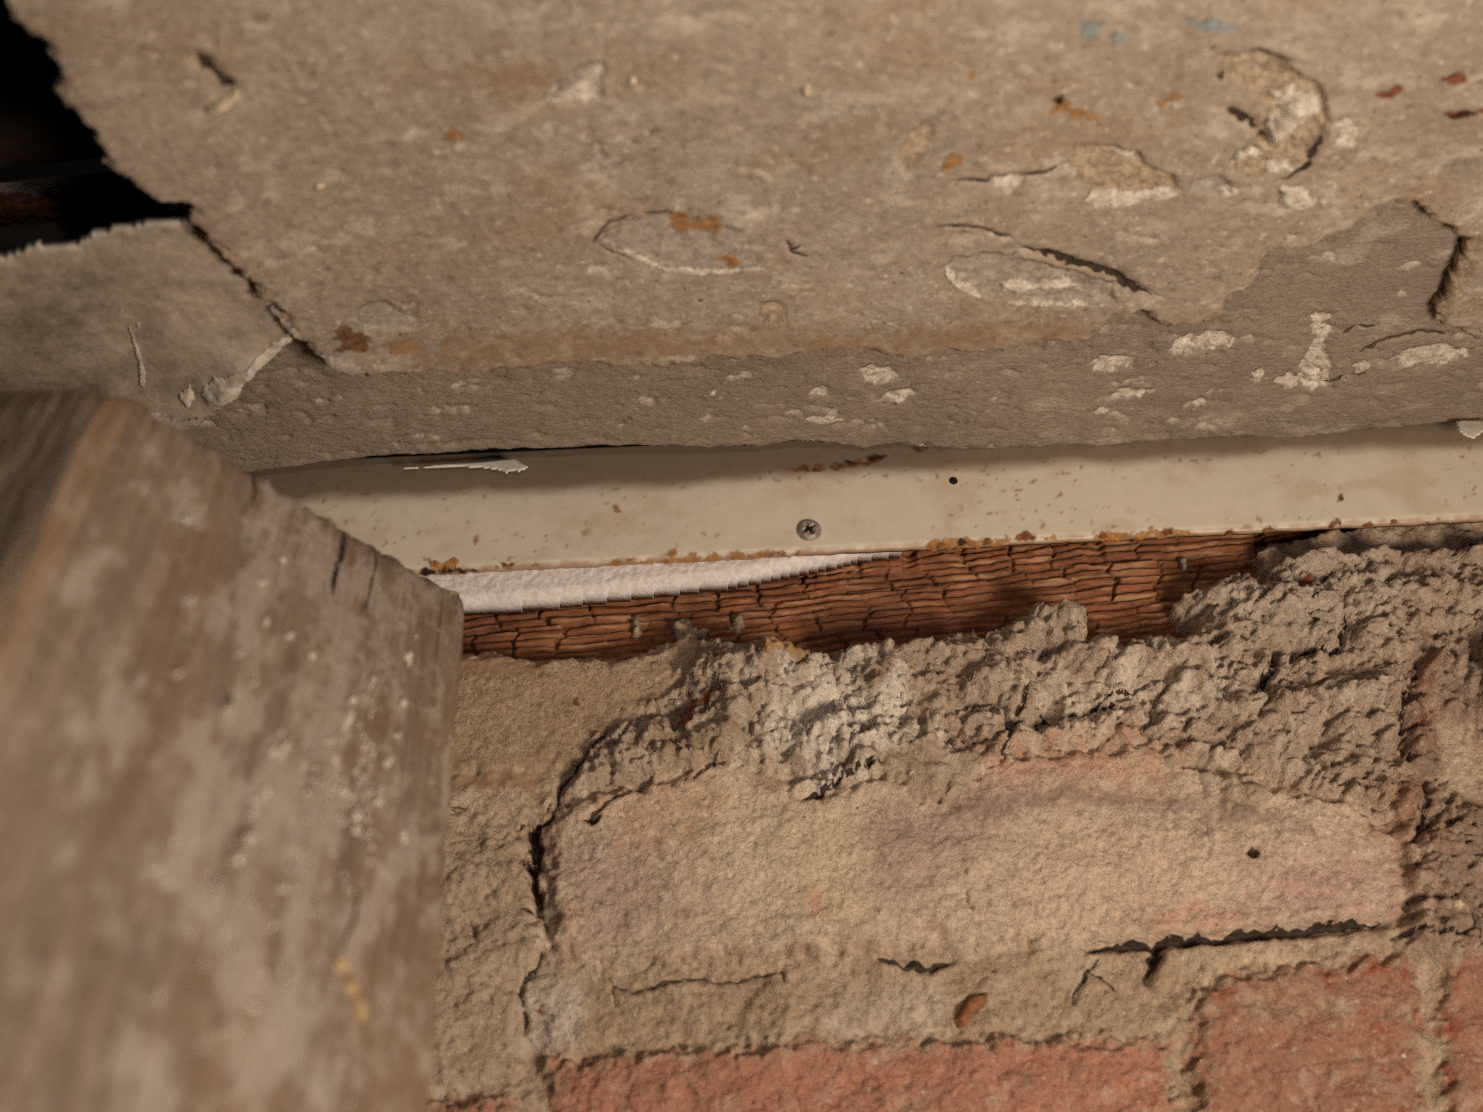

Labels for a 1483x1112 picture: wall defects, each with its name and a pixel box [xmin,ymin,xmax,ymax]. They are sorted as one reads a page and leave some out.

corrosion [0,183,168,224]
flaking render [5,0,1483,403]
crack [938,224,1152,295]
spalling [1090,355,1156,415]
spalling [802,415,844,424]
corrosion [421,557,478,576]
corrosion [611,548,802,567]
corrosion [926,531,1056,551]
crack [520,729,643,831]
crack [803,754,884,800]
crack [518,908,548,1033]
crack [877,958,949,974]